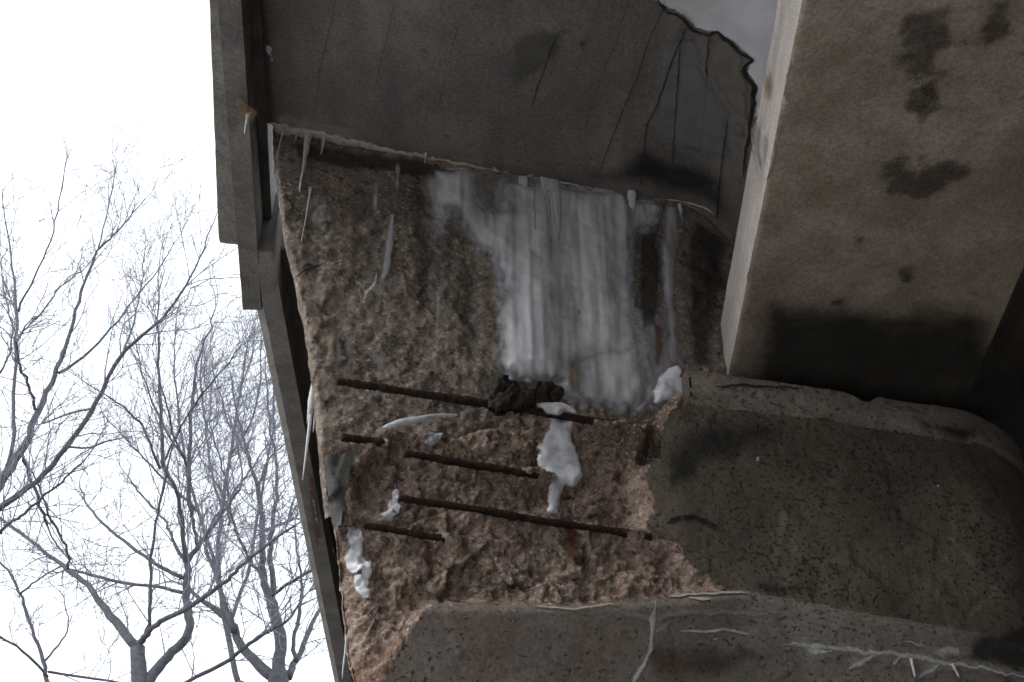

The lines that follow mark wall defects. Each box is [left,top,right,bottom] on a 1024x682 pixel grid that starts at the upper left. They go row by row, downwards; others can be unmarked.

crack [600,0,758,219]
leakage [901,14,950,115]
peeling [321,328,337,360]
leakage [626,155,734,362]
spalling [334,378,733,682]